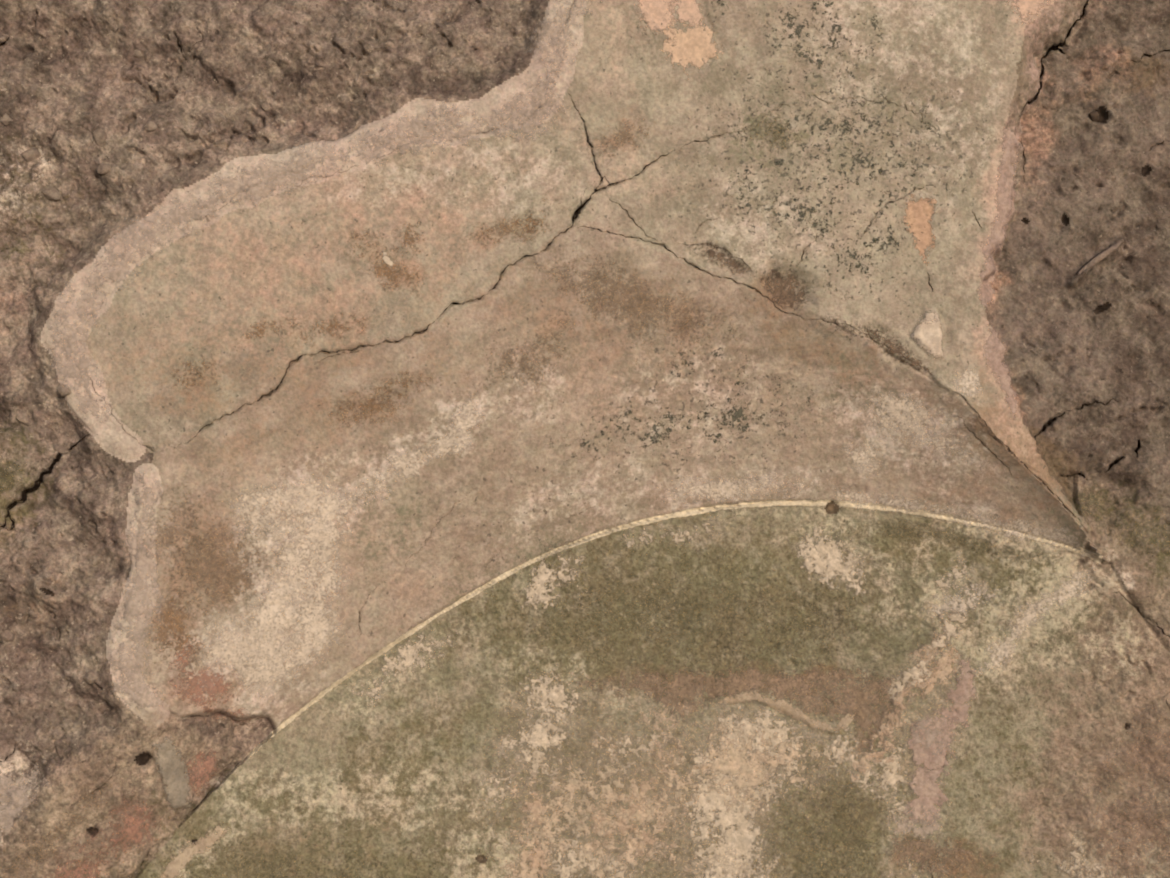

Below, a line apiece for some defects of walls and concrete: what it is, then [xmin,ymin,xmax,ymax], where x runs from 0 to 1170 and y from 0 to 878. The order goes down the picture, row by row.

peeling [634,0,723,80]
crack [1021,0,1089,184]
crack [179,93,1141,532]
crack [0,435,86,530]
leakage [110,475,392,708]
leakage [389,400,482,479]
leakage [664,477,804,501]
leakage [837,489,1094,670]